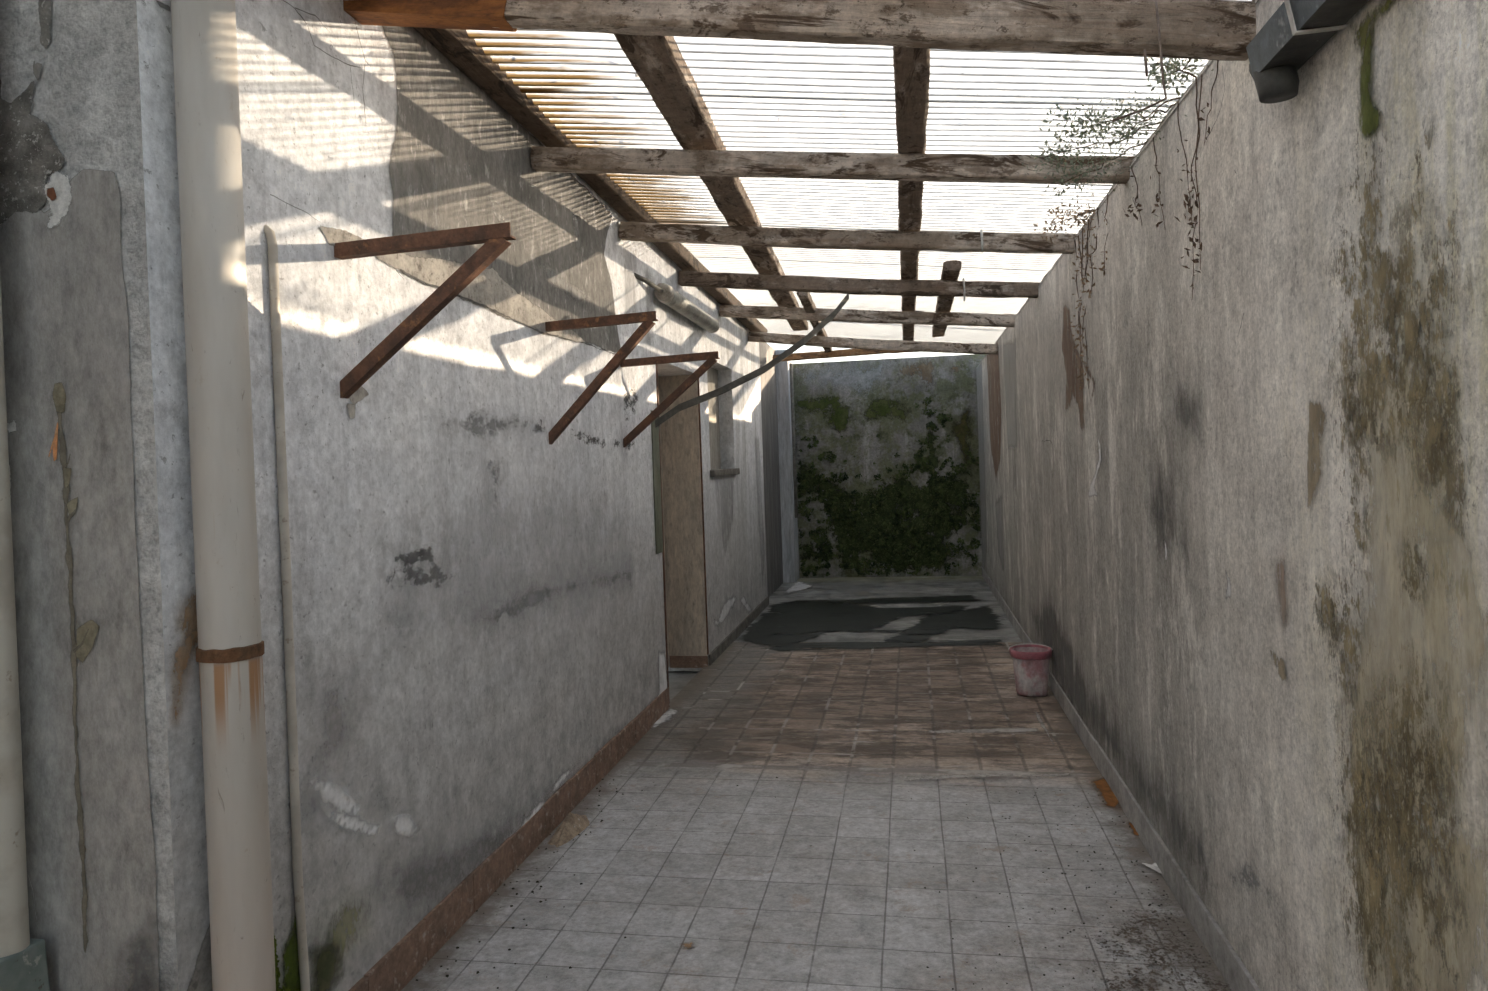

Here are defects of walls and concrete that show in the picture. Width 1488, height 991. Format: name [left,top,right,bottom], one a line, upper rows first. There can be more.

peeling [0,0,65,226]
spalling [320,226,364,246]
peeling [376,26,621,353]
damp [386,547,452,588]
rust [173,593,198,718]